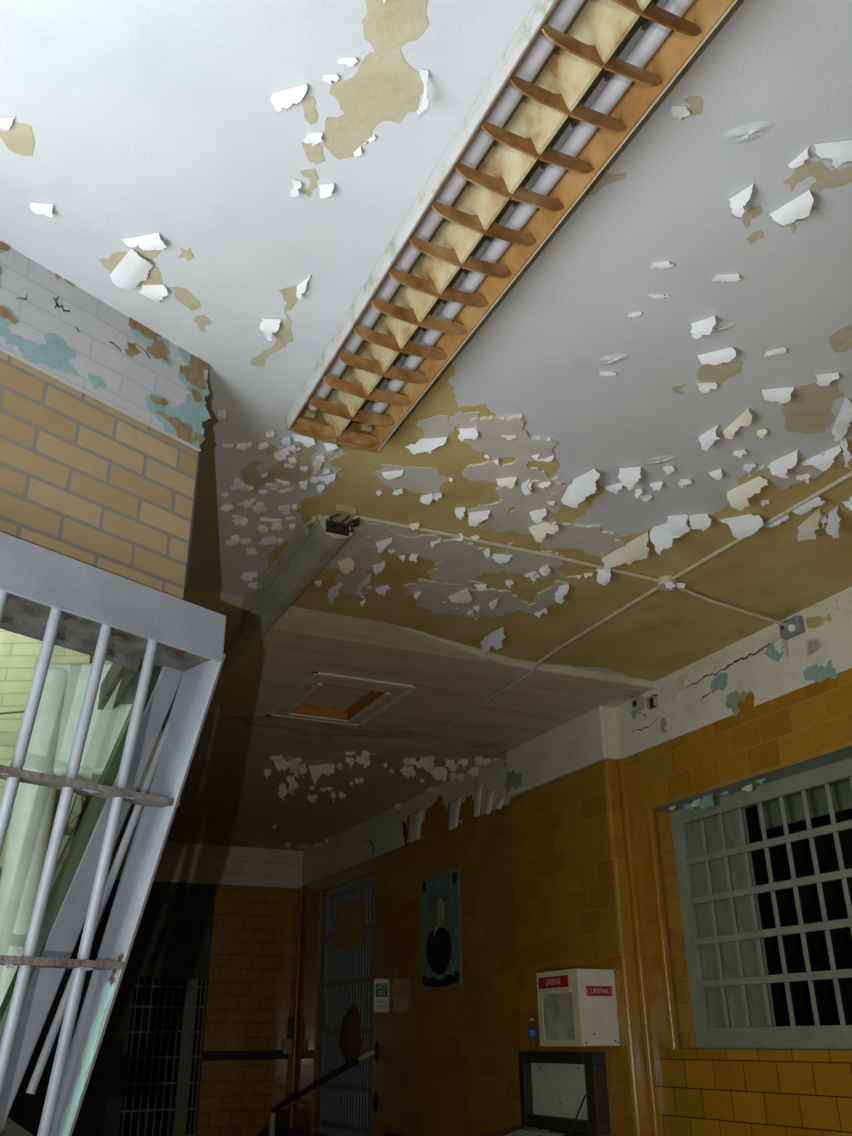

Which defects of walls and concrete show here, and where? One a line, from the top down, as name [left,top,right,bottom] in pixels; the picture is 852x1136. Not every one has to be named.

peeling [0,116,34,156]
peeling [271,0,429,199]
peeling [729,140,852,245]
peeling [0,305,106,389]
peeling [99,233,212,332]
peeling [124,317,227,447]
peeling [691,315,716,339]
peeling [672,347,743,394]
peeling [221,362,852,684]
crack [679,640,776,700]
peeling [711,672,755,717]
peeling [262,751,522,843]